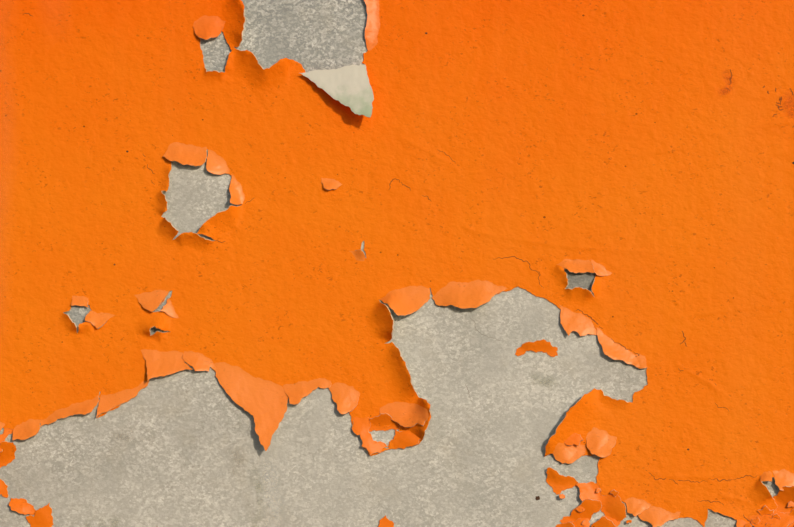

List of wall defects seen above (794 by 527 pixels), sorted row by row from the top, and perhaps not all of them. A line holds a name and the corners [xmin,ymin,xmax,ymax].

peeling [193,0,380,118]
peeling [162,142,245,240]
peeling [556,259,612,294]
peeling [0,280,794,527]